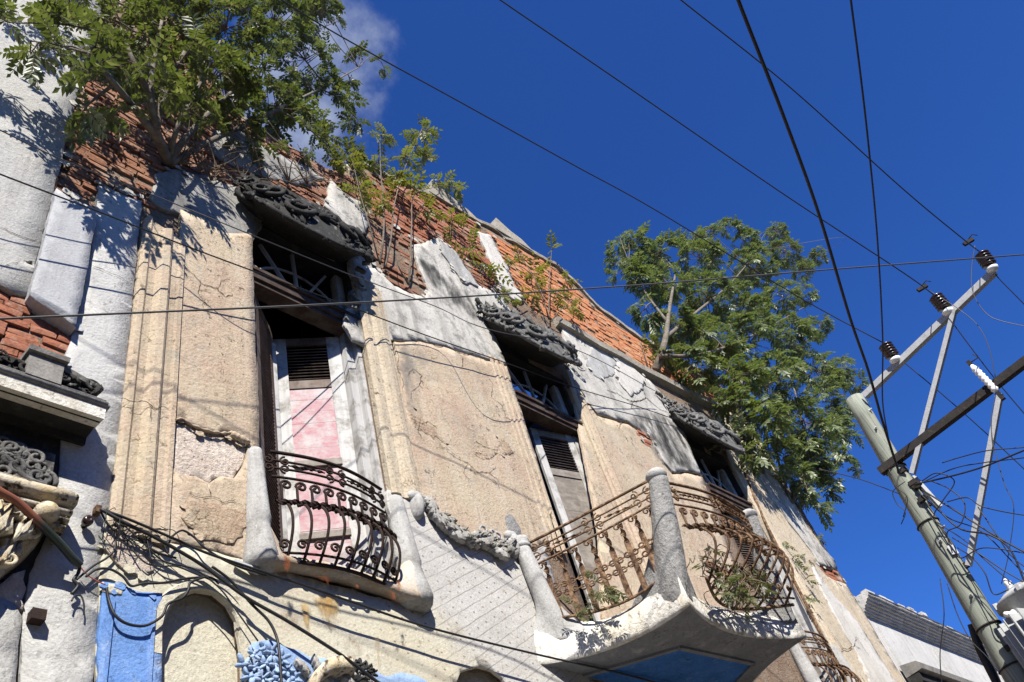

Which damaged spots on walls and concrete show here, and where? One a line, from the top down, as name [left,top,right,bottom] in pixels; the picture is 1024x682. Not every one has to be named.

spalling [54,55,717,399]
spalling [0,290,84,366]
crack [397,334,509,440]
spalling [173,417,253,483]
spalling [179,497,246,545]
rust [302,595,337,626]